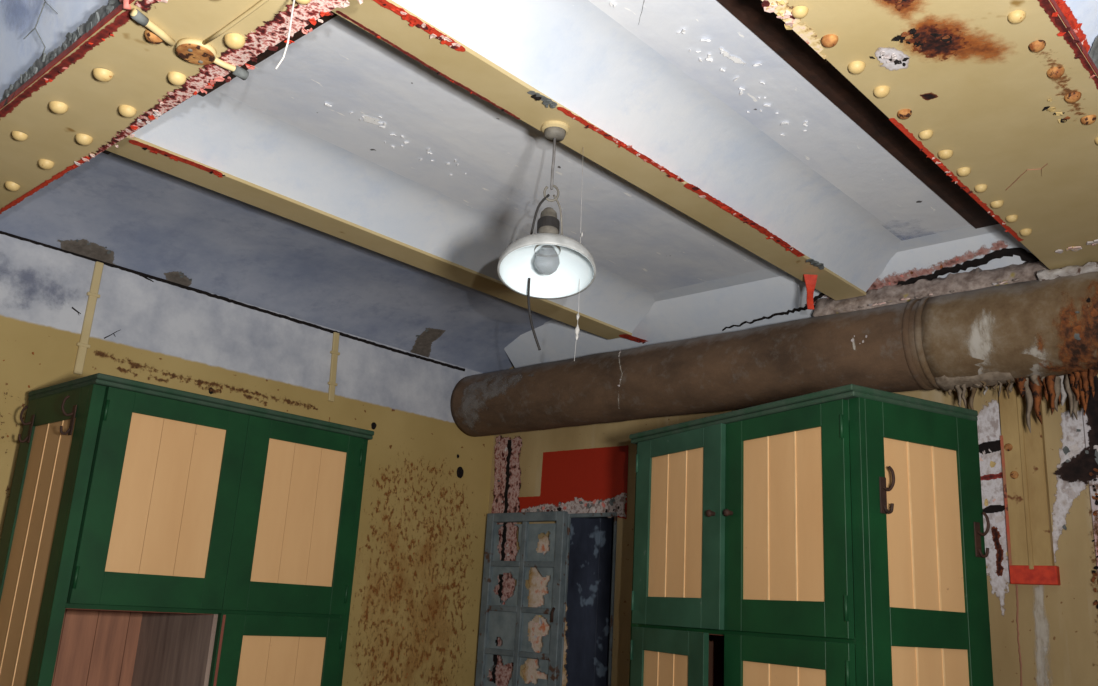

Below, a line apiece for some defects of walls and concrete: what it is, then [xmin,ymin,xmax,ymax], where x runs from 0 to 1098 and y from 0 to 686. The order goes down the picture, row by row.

crack [23,0,58,55]
spalling [0,0,168,103]
peeling [67,0,466,178]
rust [877,0,1007,61]
rust [1042,52,1083,123]
crack [722,293,825,331]
crack [897,248,1040,285]
rust [1014,281,1098,433]
rust [351,458,474,686]
peeling [491,435,627,604]
peeling [977,399,1010,615]
peeling [1052,375,1098,563]